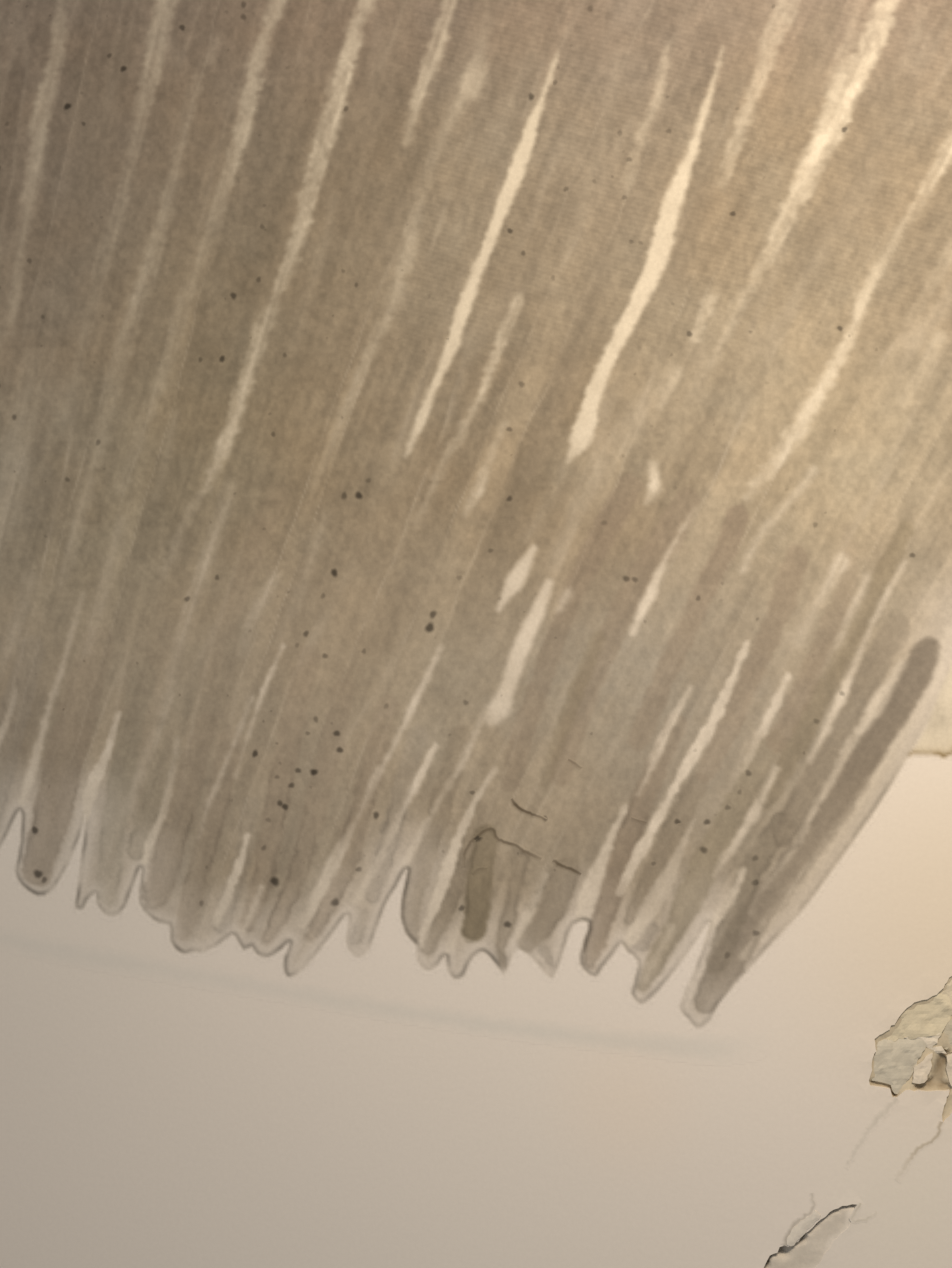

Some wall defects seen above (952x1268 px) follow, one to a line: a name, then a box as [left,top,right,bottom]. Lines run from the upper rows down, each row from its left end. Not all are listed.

damp [0,688,18,742]
damp [904,666,952,762]
damp [732,746,786,839]
damp [748,729,868,916]
damp [32,868,48,884]
damp [268,875,281,889]
damp [0,925,772,1066]
spalling [869,976,952,1121]
crack [893,1121,945,1184]
crack [764,1193,877,1268]